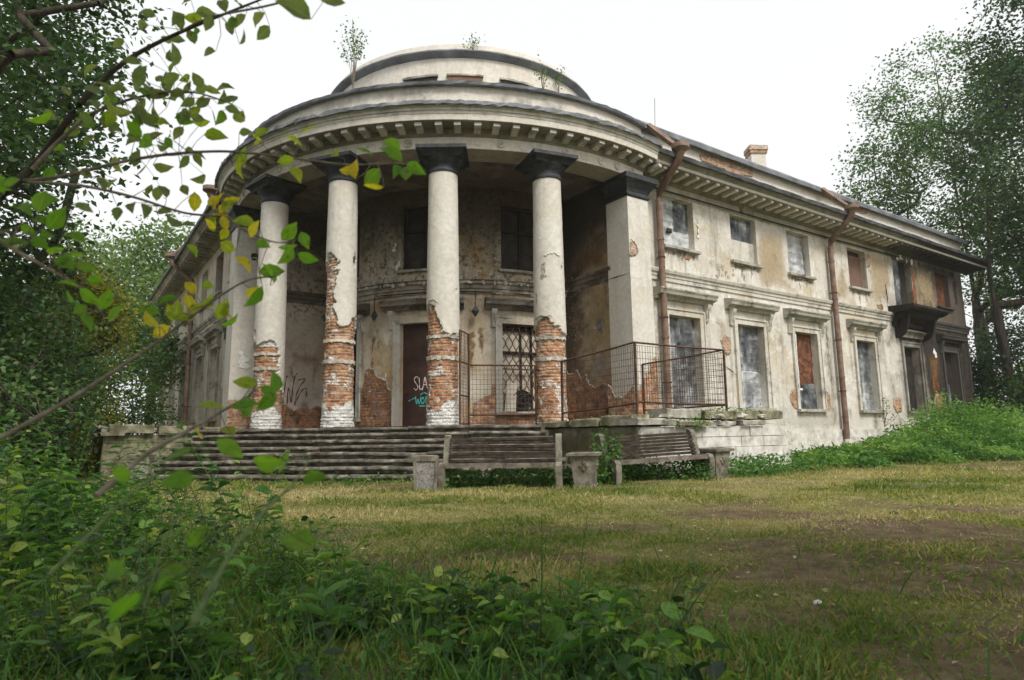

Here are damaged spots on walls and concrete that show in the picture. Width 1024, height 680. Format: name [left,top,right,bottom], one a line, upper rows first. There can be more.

flaking render [700,154,753,177]
flaking render [226,253,392,429]
flaking render [426,290,659,428]